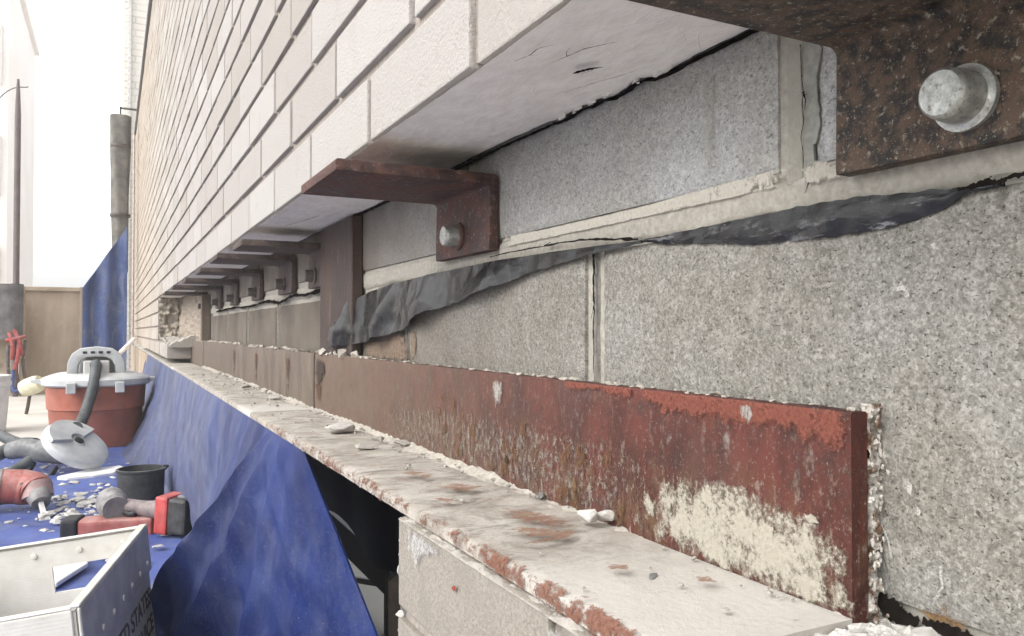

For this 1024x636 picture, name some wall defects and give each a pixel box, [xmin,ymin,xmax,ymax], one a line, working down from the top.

crack [453,29,759,170]
crack [799,44,807,164]
crack [358,201,390,216]
corrosion [266,423,409,511]
corrosion [420,514,638,636]
corrosion [505,508,576,544]
leakage [390,408,853,608]